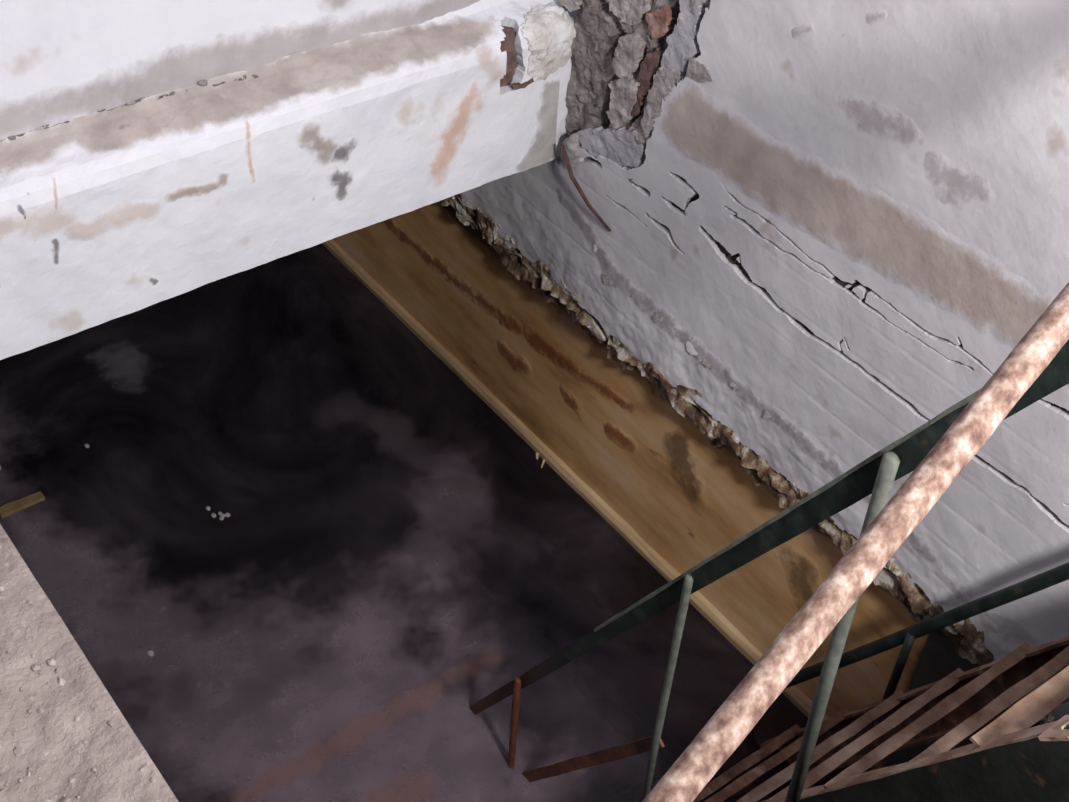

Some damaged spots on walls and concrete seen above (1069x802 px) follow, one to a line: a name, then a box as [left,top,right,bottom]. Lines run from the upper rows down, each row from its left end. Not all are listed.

damp [0,196,164,248]
damp [0,0,480,140]
rust [425,43,507,190]
peeling [0,0,1056,349]
crack [643,174,699,231]
damp [837,94,996,211]
spalling [438,185,845,509]
crack [704,229,920,413]
spalling [812,517,857,555]
spalling [872,554,945,622]
spalling [940,618,996,666]
crack [975,454,1069,526]